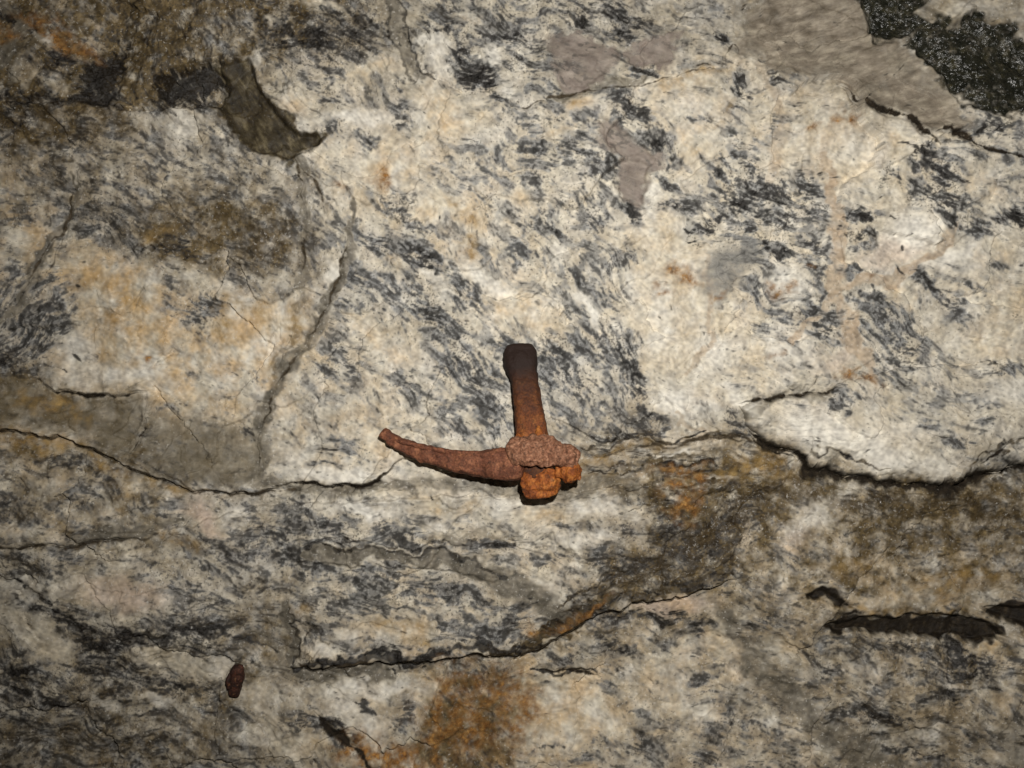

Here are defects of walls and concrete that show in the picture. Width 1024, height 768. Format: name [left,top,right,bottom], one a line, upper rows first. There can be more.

spalling [550,30,682,94]
spalling [739,0,972,132]
crack [296,162,323,201]
spalling [599,121,663,208]
crack [312,250,346,334]
crack [39,379,131,399]
crack [744,388,834,402]
crack [0,427,389,496]
crack [605,434,1024,497]
crack [300,597,680,675]